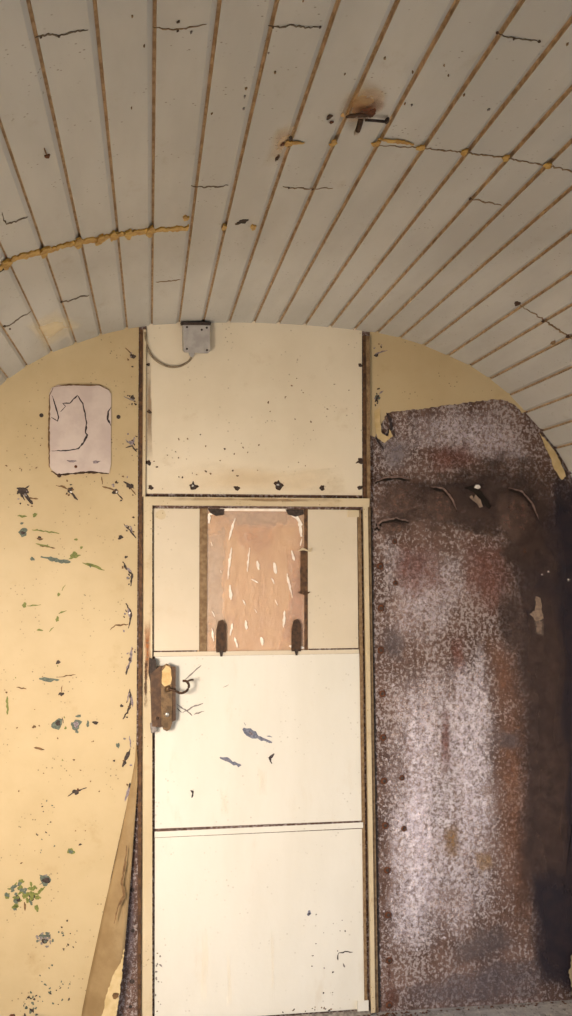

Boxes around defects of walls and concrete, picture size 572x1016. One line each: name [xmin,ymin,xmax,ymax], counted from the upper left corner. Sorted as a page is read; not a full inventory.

crack [35,29,88,39]
crack [153,20,207,32]
crack [268,22,322,30]
rust [326,96,376,124]
crack [379,145,572,173]
peeling [17,486,38,507]
peeling [101,475,136,501]
peeling [356,388,572,1012]
rust [446,831,457,852]